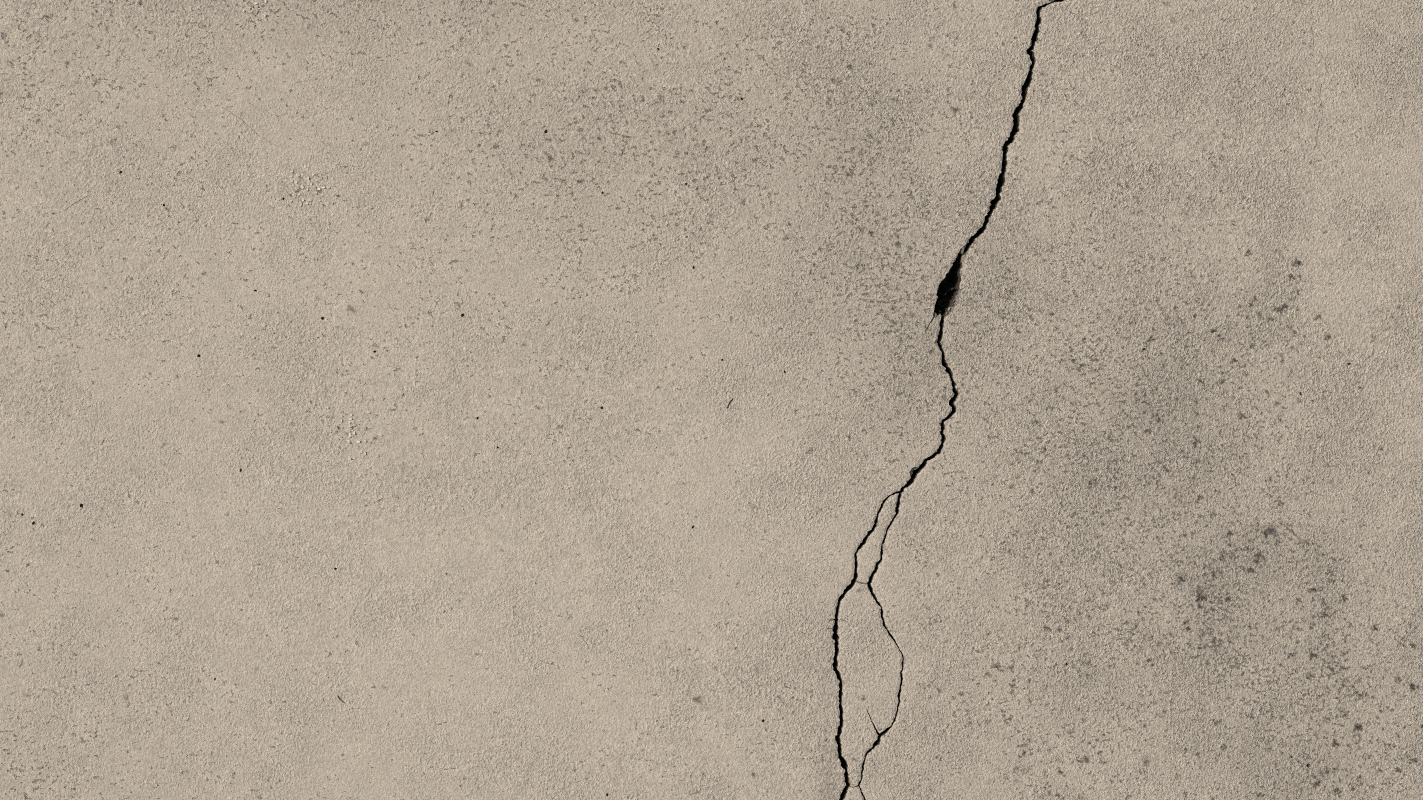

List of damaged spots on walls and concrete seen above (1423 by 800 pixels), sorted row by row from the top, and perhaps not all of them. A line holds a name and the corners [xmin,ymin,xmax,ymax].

crack [953,0,1064,263]
crack [827,317,960,800]